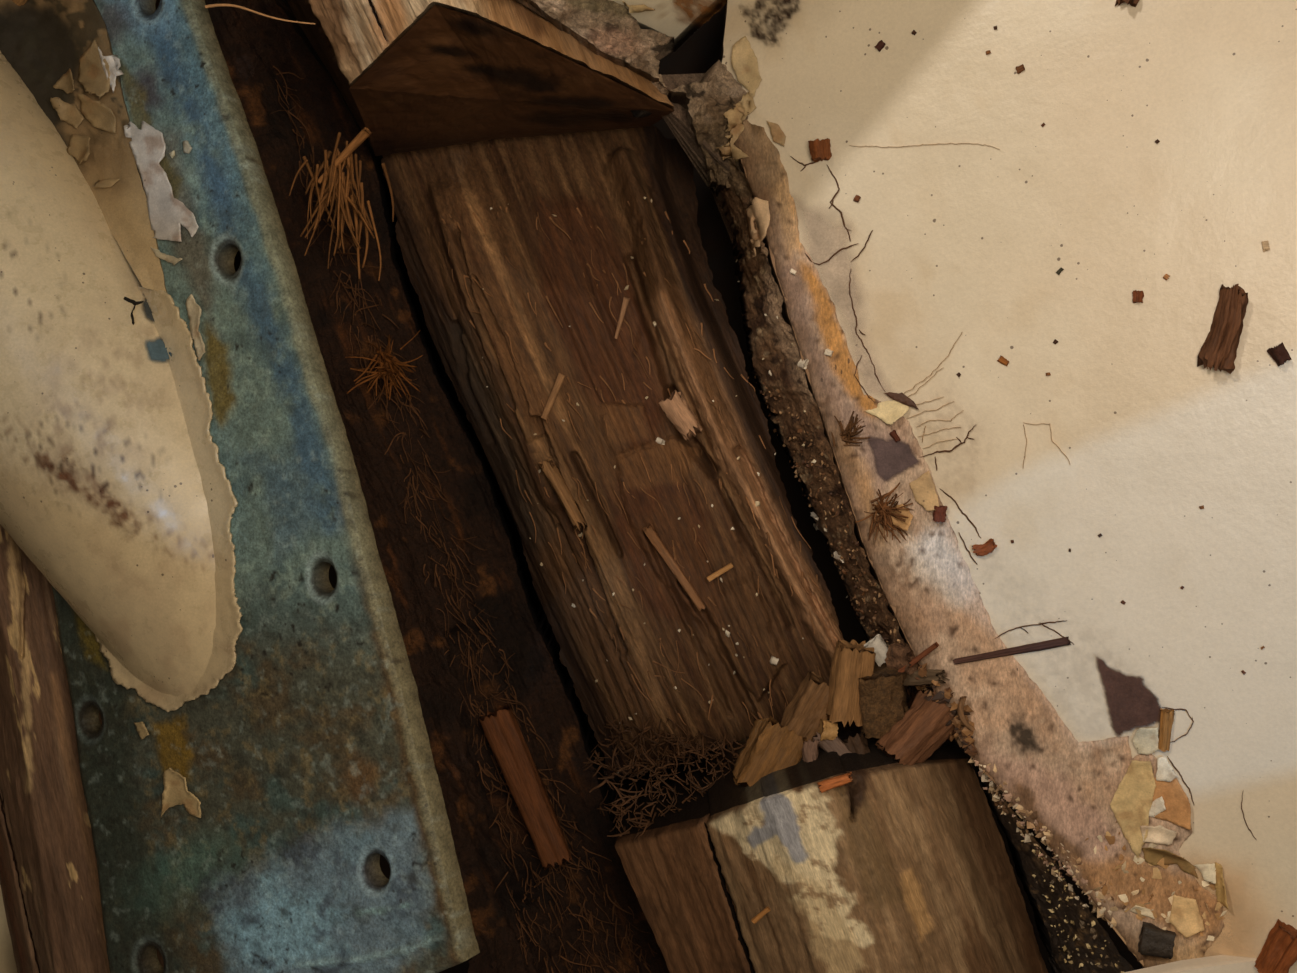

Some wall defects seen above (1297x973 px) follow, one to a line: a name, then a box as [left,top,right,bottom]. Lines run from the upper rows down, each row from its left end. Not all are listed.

mould [744,0,798,43]
crack [792,143,995,564]
peeling [710,36,1229,968]
crack [1023,422,1070,465]